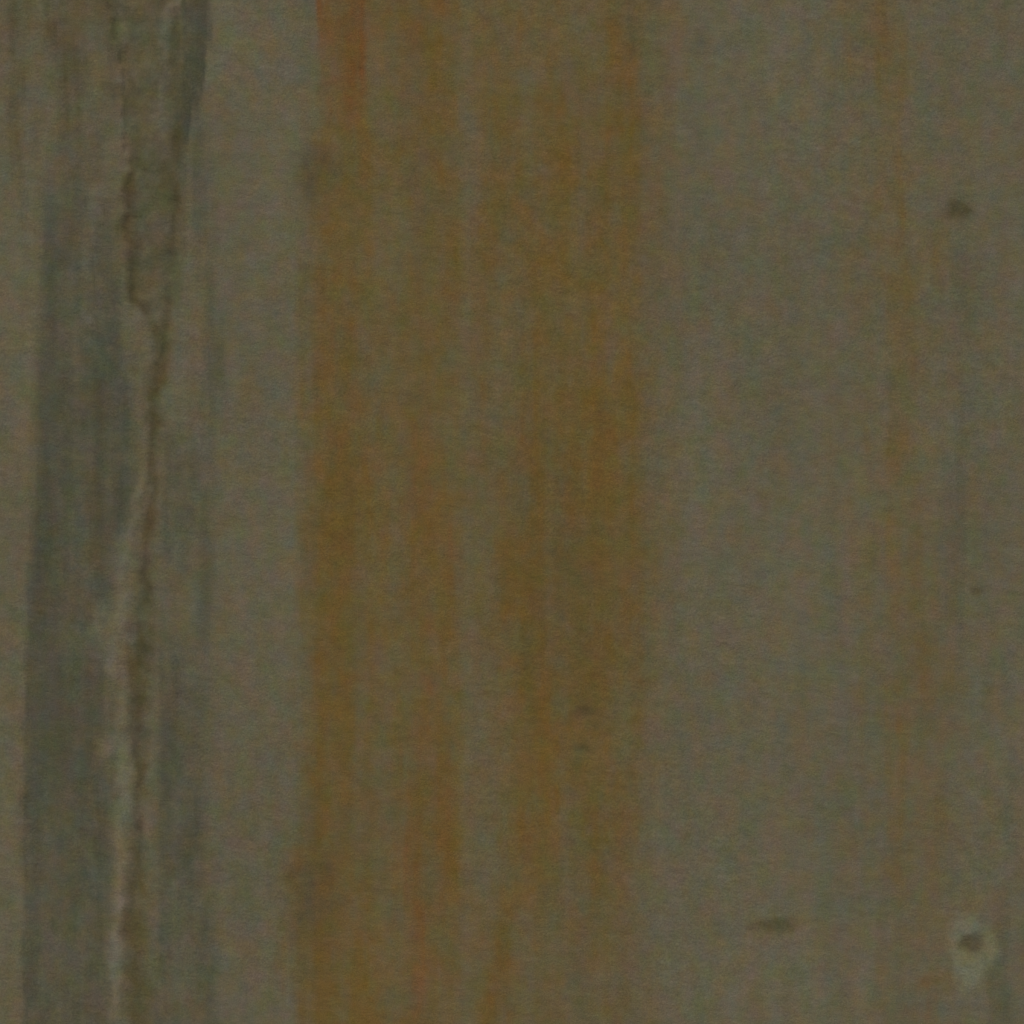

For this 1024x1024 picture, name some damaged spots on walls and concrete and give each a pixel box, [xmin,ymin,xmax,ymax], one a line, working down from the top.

leakage [0,0,232,1024]
rust [254,0,712,1024]